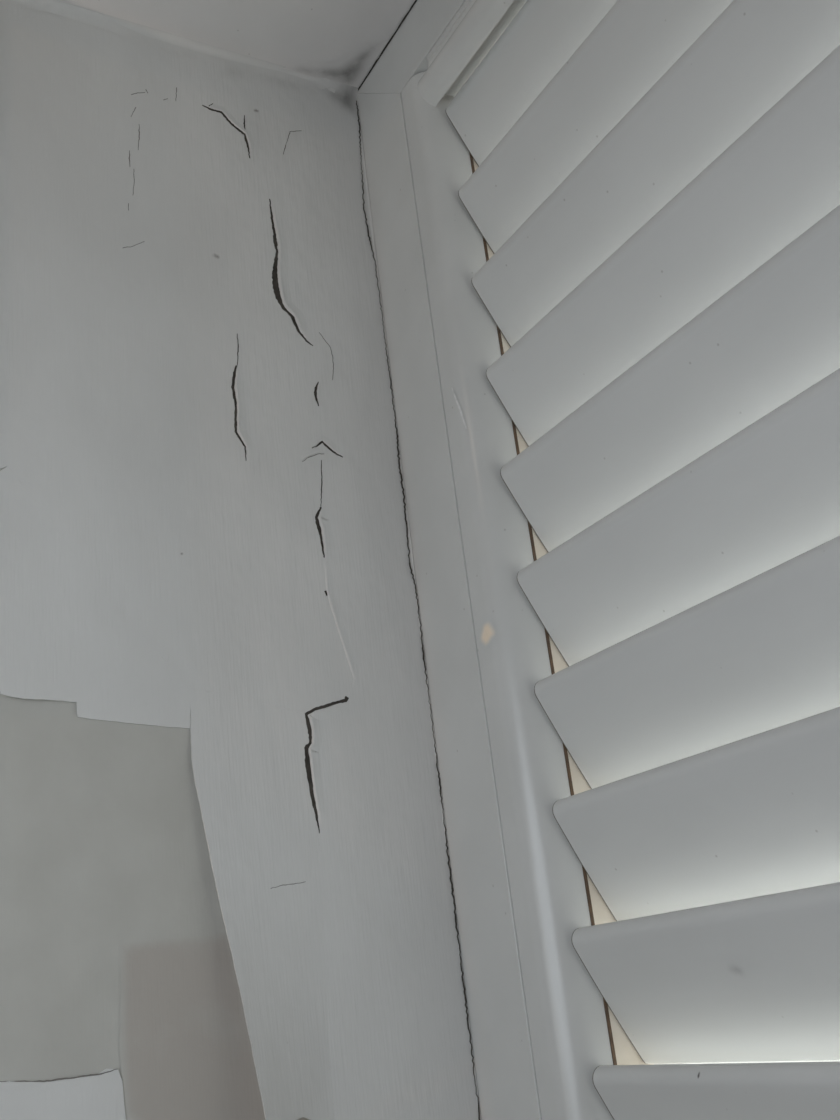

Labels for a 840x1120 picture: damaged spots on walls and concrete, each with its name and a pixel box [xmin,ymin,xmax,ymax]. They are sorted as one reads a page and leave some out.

crack [128,87,302,211]
crack [231,334,256,462]
crack [269,199,334,406]
crack [297,434,361,833]
peeling [0,466,335,1120]